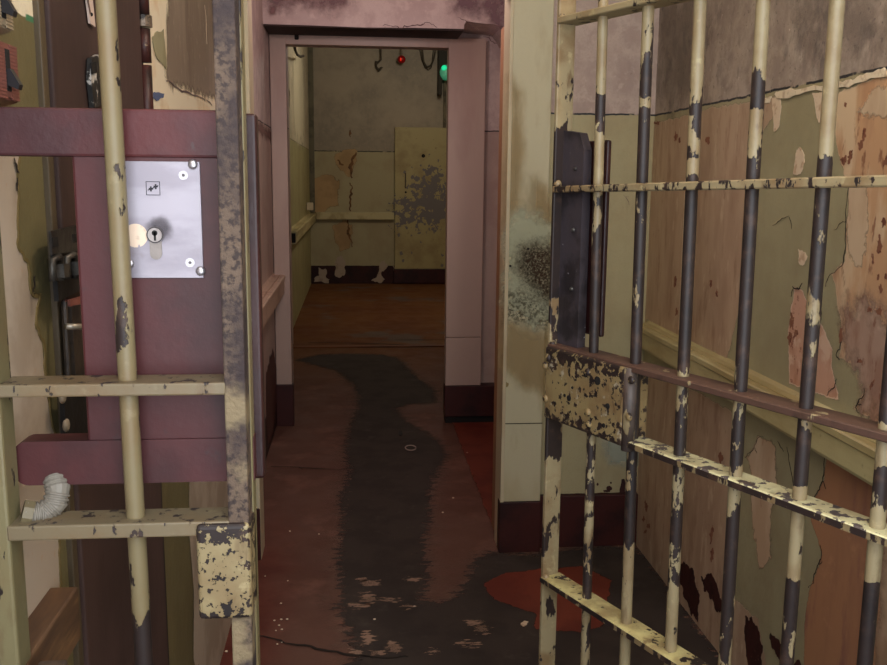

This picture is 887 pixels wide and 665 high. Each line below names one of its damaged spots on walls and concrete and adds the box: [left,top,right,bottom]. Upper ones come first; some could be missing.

peeling [143,0,215,110]
peeling [835,68,887,176]
peeling [0,156,47,377]
damp [508,211,551,331]
peeling [691,102,750,358]
peeling [815,187,887,421]
peeling [297,353,542,665]
peeling [815,460,872,517]
peeling [23,540,62,618]
peeling [558,546,623,610]
peeling [555,624,664,665]
peeling [804,518,867,665]